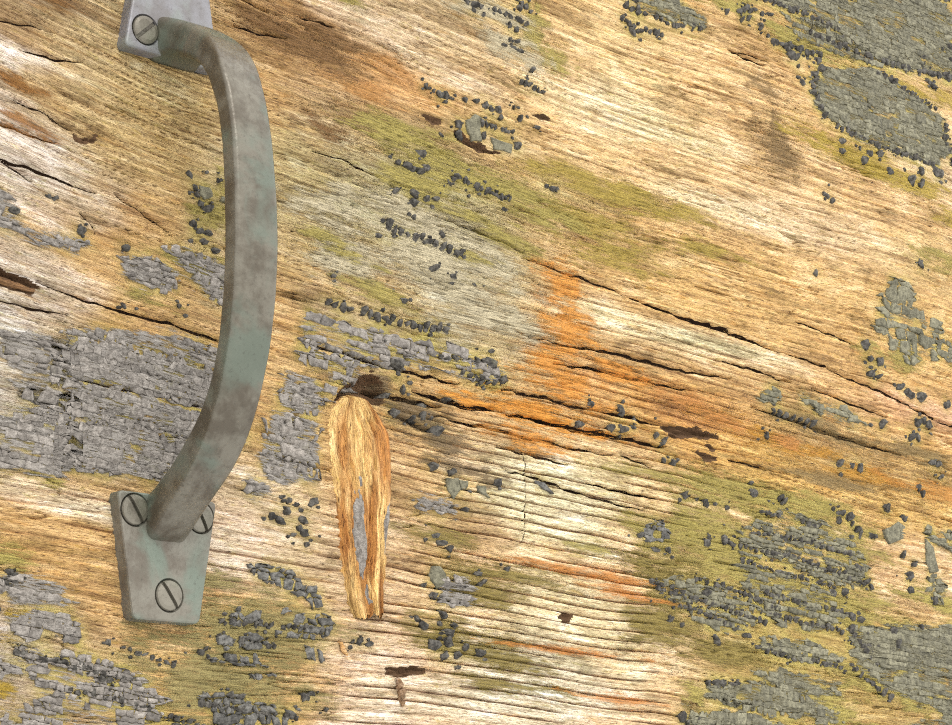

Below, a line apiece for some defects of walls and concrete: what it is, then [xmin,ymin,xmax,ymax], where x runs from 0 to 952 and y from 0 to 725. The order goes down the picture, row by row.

crack [0,100,69,142]
peeling [420,77,542,154]
peeling [464,0,538,53]
peeling [620,0,713,42]
peeling [721,0,952,188]
peeling [116,170,225,318]
peeling [375,218,466,285]
peeling [0,322,218,481]
peeling [241,298,508,547]
peeling [860,276,952,381]
peeling [0,563,335,725]
peeling [648,481,952,725]